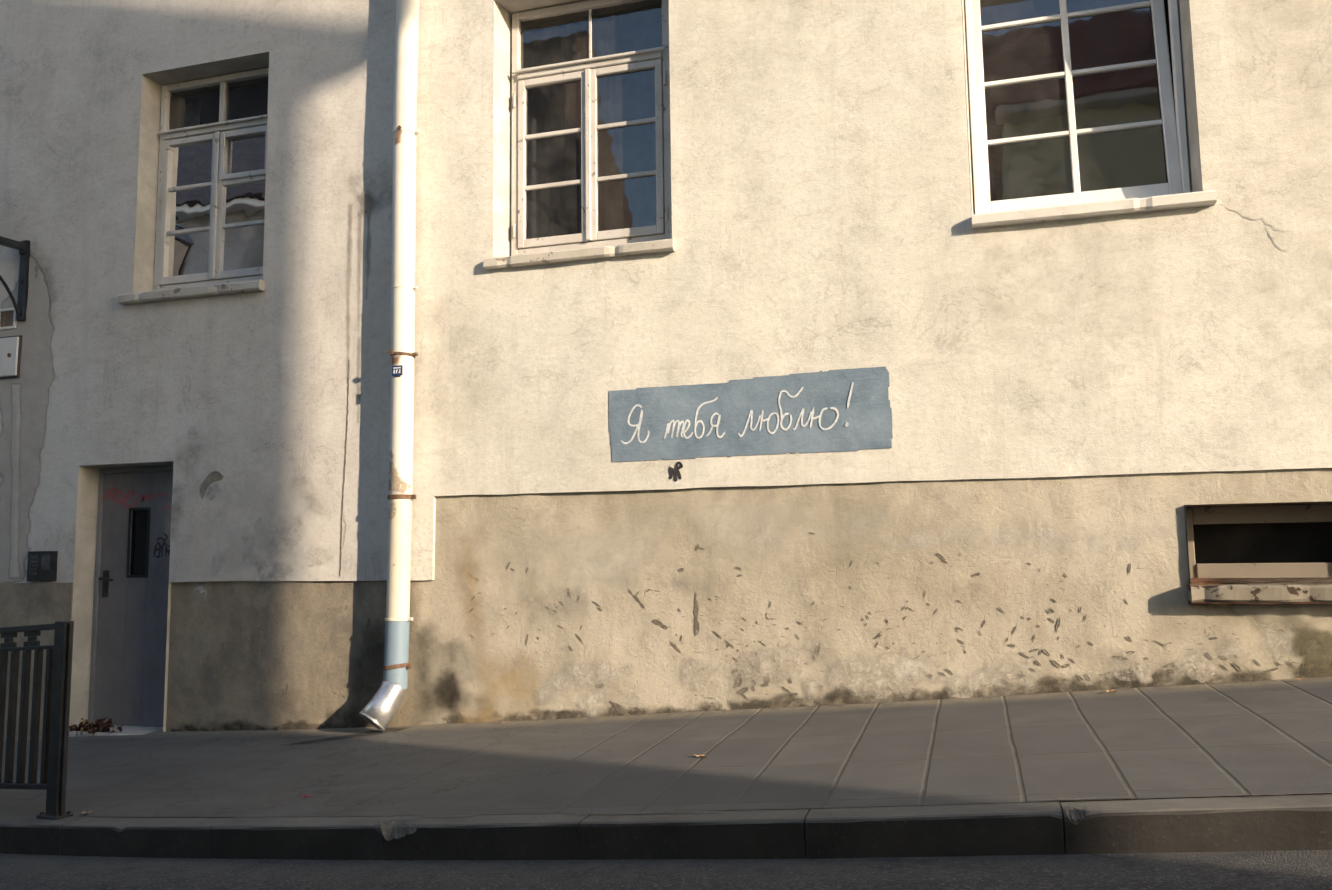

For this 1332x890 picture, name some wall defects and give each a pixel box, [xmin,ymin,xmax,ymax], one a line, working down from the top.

damp [348,195,370,289]
flaking render [199,471,225,511]
peeling [389,451,410,518]
damp [419,634,1271,724]